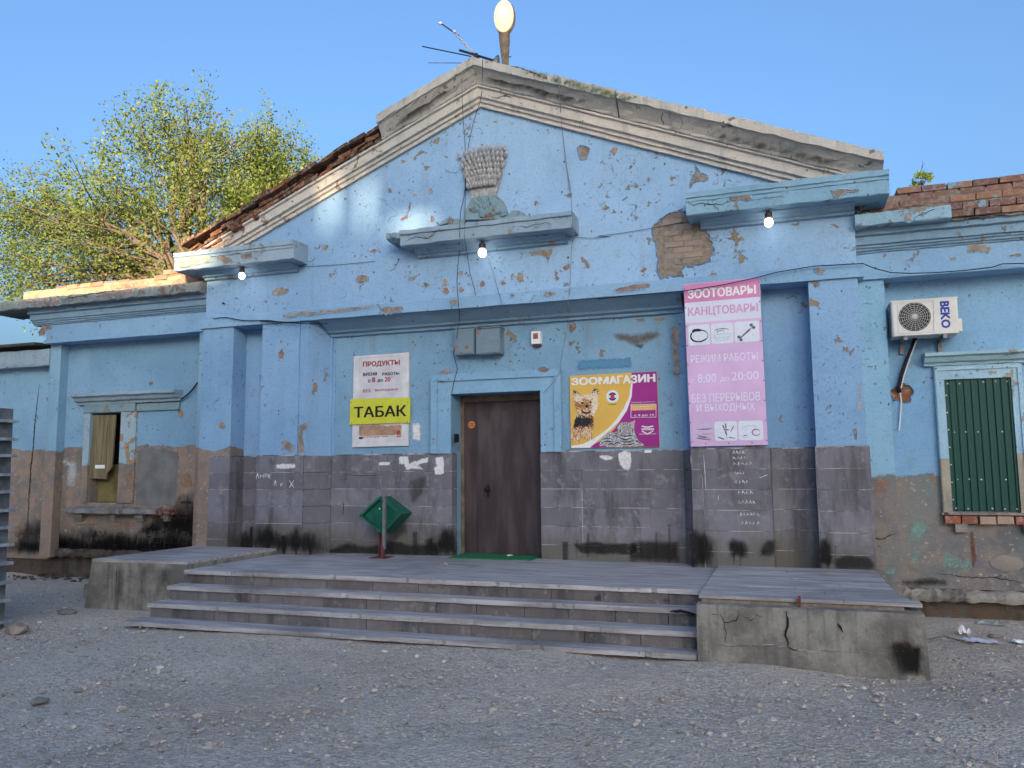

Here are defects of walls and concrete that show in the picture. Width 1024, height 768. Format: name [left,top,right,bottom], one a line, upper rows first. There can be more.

flaking render [576,145,591,161]
flaking render [689,165,709,188]
spalling [615,209,715,293]
peeling [635,317,681,375]
spalling [890,383,915,403]
water stain [58,477,194,552]
water stain [12,524,41,551]
water stain [576,542,678,561]
water stain [762,541,775,555]
water stain [826,556,874,569]
crack [669,609,885,663]